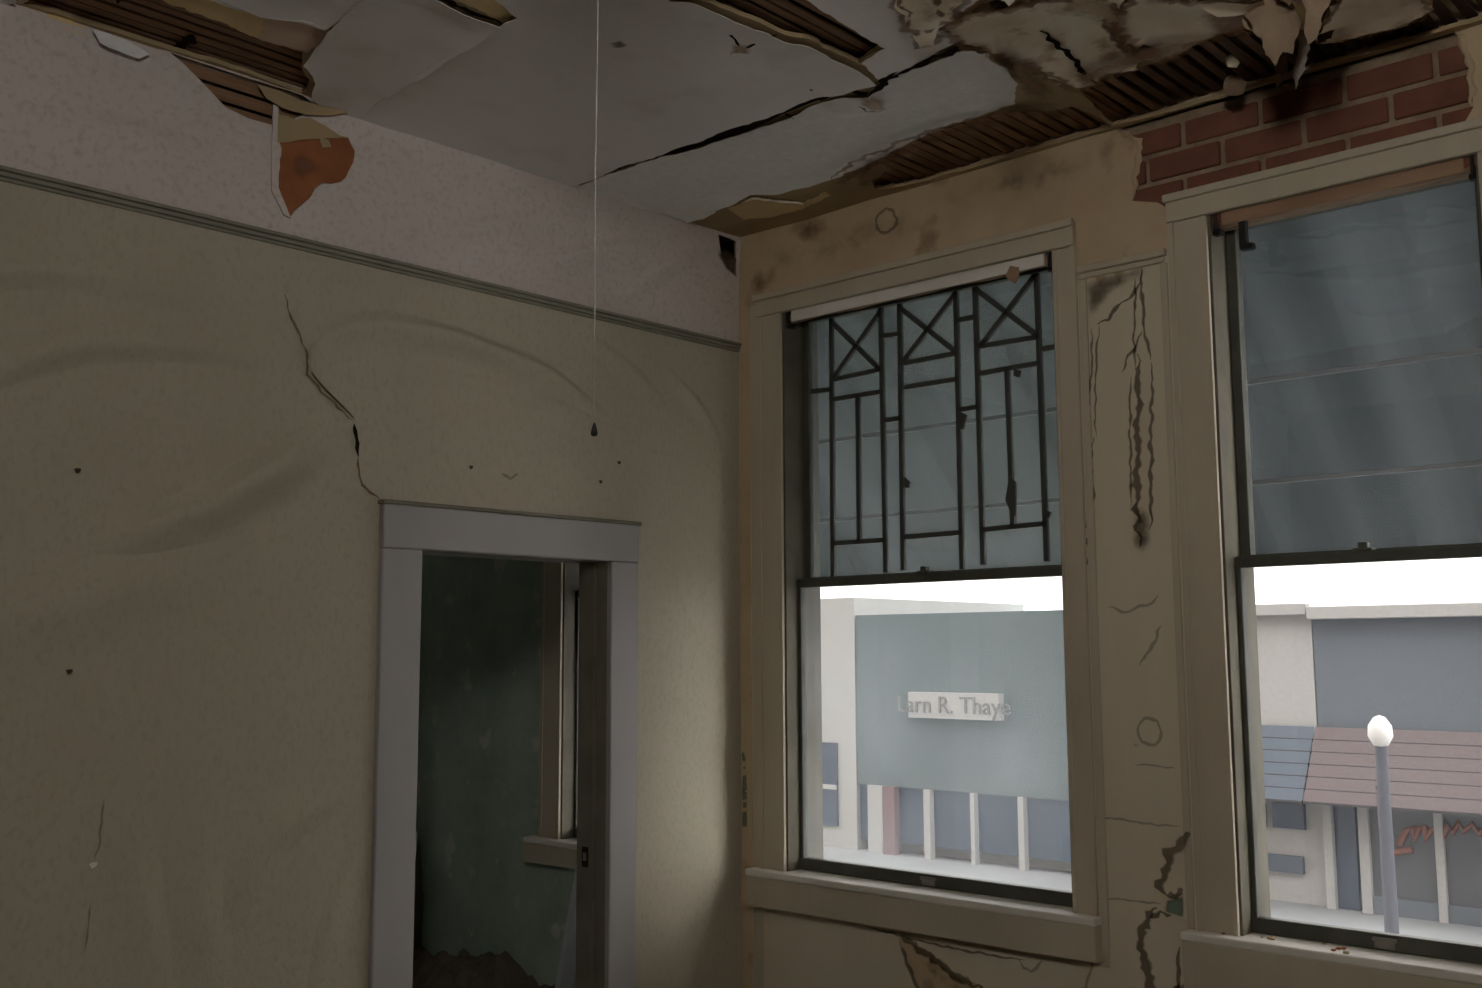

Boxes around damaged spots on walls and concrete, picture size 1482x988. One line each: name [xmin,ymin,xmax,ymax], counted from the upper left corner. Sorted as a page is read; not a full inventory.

peeling [163,0,329,53]
peeling [442,0,512,25]
crack [729,34,778,48]
peeling [988,0,1015,9]
damp [1211,15,1252,35]
flaking render [1114,0,1478,206]
damp [831,54,1061,185]
spalling [271,104,355,218]
peeling [728,191,831,220]